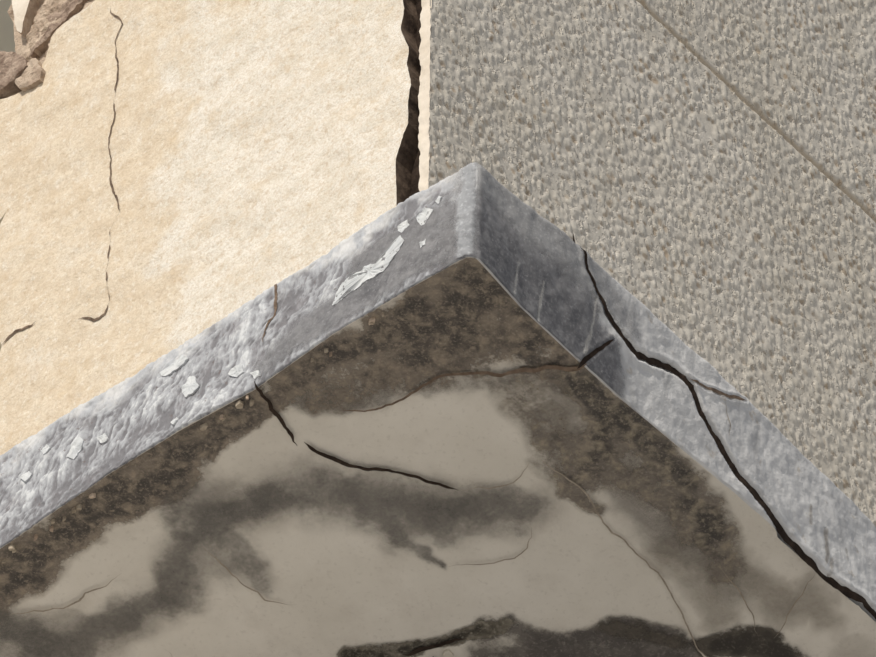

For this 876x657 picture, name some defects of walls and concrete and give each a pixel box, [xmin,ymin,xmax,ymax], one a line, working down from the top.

flaking render [0,0,89,99]
crack [415,0,423,49]
crack [79,8,123,321]
crack [411,149,420,196]
peeling [66,437,84,459]
damp [0,162,804,657]
crack [344,234,876,636]
crack [254,381,708,657]
crack [200,542,287,605]